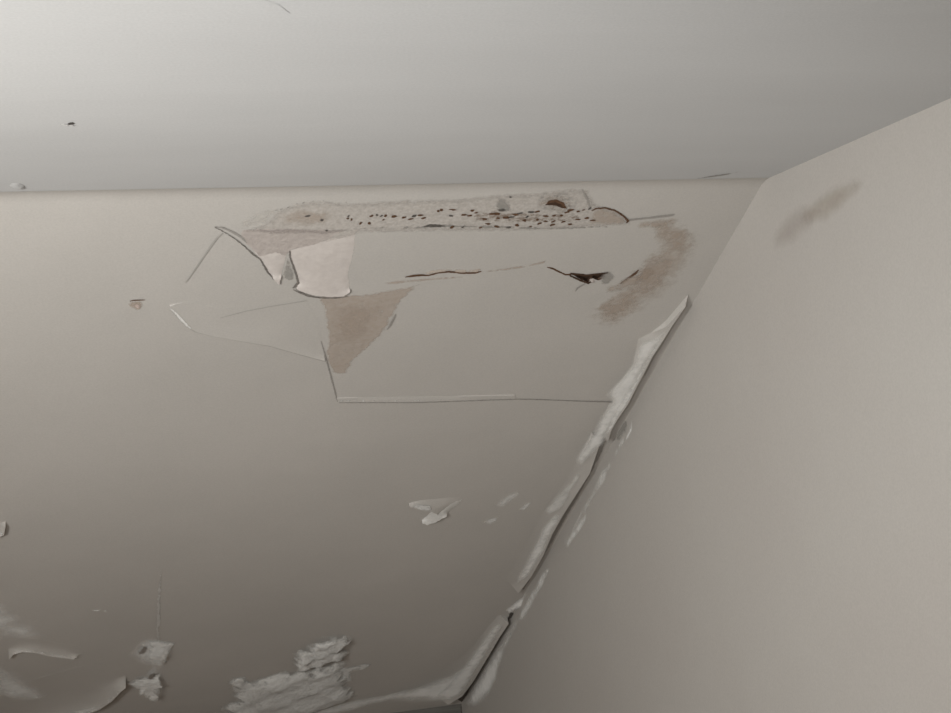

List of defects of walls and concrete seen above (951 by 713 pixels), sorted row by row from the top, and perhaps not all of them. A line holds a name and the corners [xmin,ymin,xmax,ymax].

peeling [215,191,639,299]
crack [391,262,544,284]
water stain [322,289,411,373]
peeling [395,295,688,705]
peeling [129,673,162,701]
peeling [139,641,174,661]